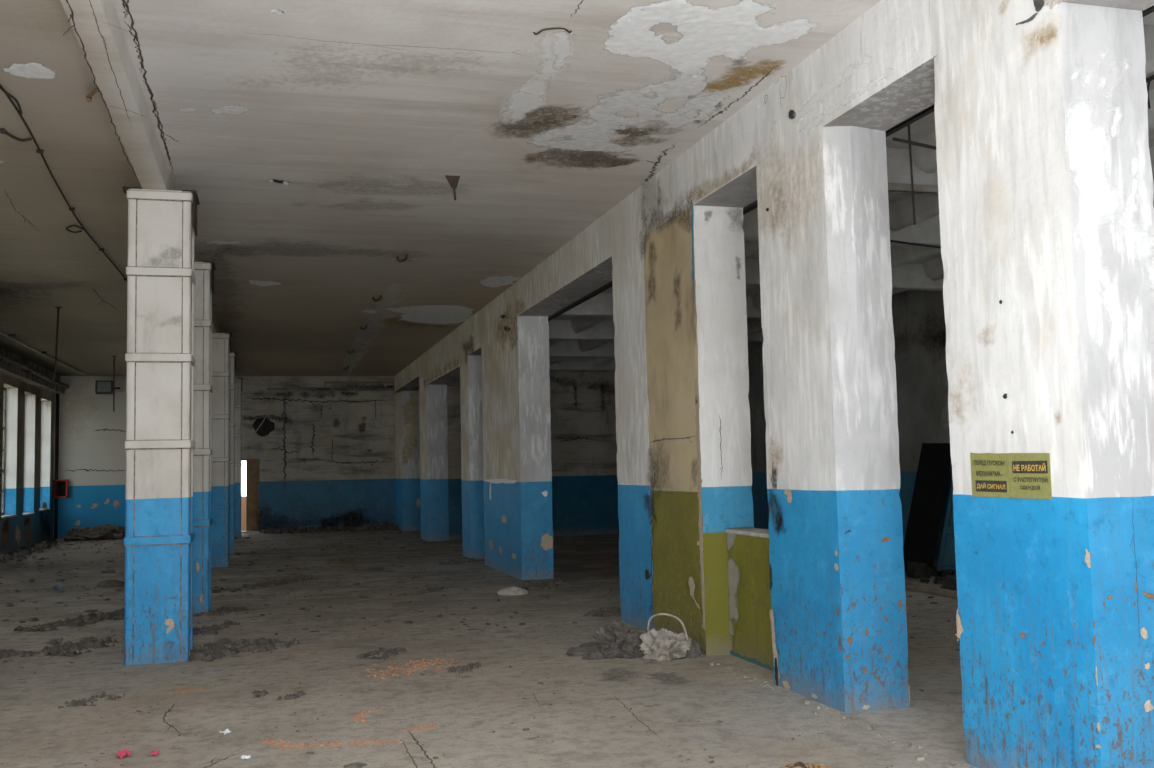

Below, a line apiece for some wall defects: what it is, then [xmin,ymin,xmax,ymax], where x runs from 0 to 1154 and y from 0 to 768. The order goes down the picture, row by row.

peeling [2,62,56,79]
damp [498,32,576,137]
peeling [528,0,819,153]
damp [527,127,660,167]
peeling [727,533,739,635]
spalling [730,609,790,690]
crack [403,731,436,768]